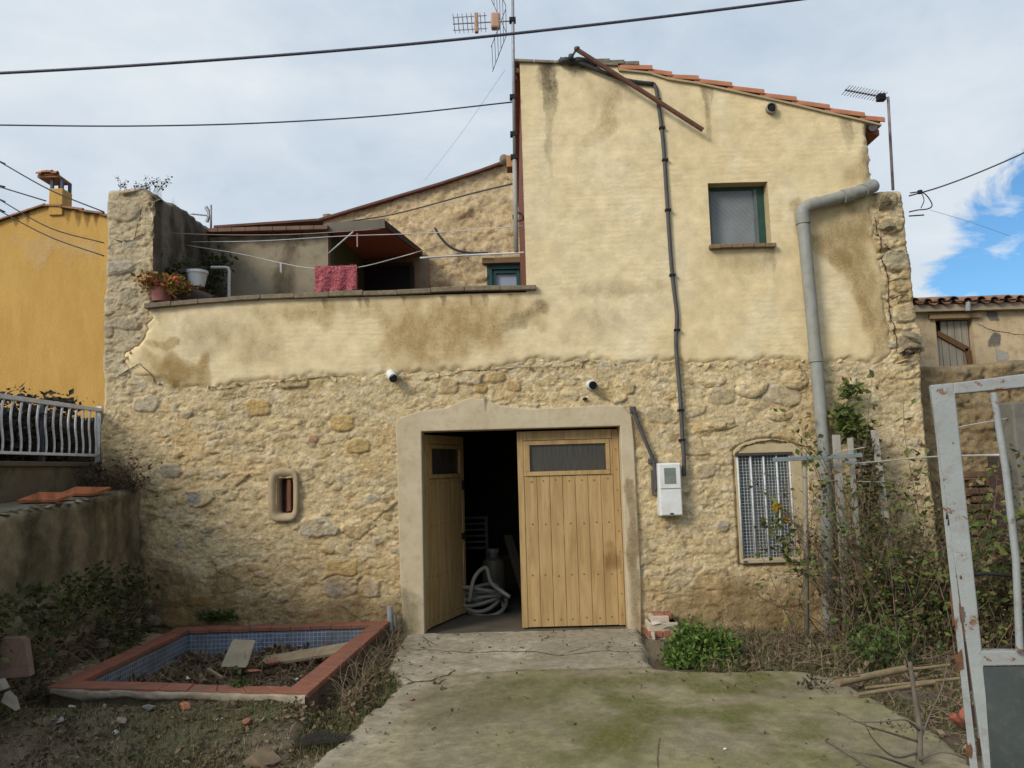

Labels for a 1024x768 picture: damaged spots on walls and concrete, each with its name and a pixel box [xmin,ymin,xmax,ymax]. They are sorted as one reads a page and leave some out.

leakage [150,338,207,389]